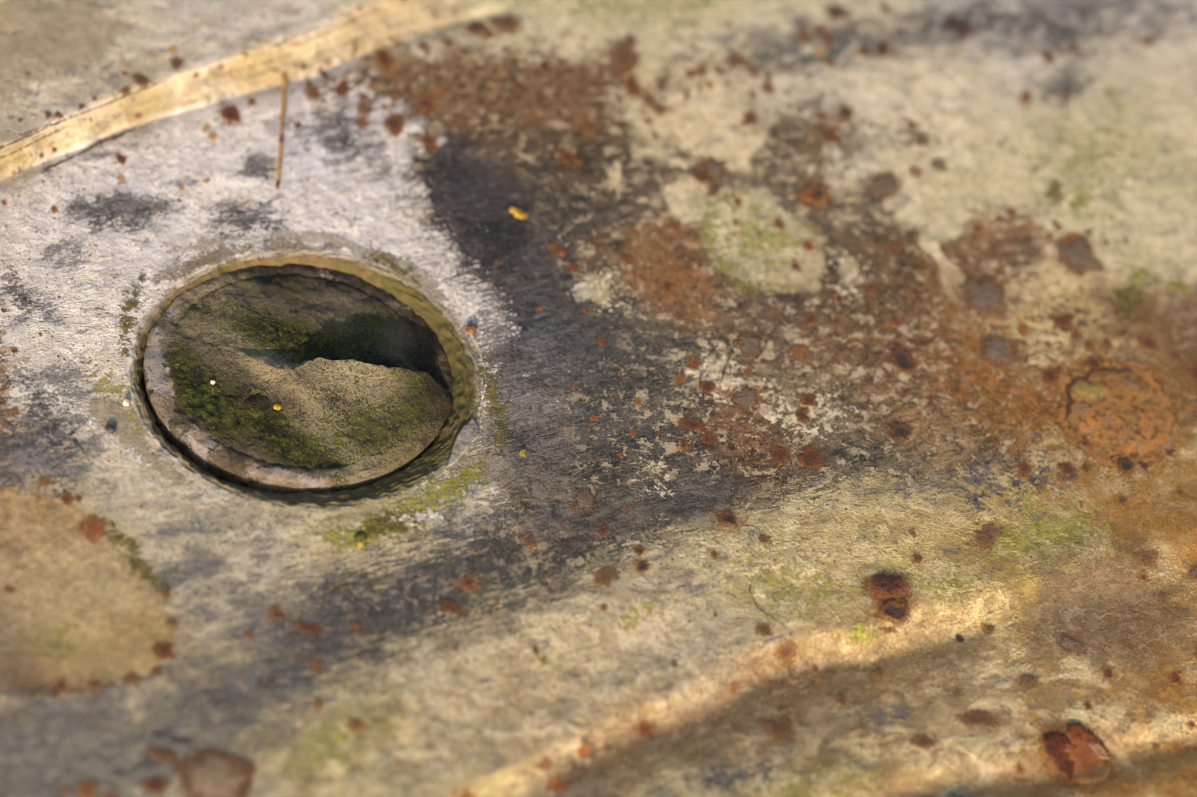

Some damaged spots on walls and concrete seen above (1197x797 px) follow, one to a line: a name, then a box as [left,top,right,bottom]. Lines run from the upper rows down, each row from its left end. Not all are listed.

corrosion [271,15,946,197]
corrosion [1019,88,1047,106]
corrosion [674,355,716,394]
corrosion [908,261,1197,482]
corrosion [795,392,818,423]
corrosion [677,418,713,454]
corrosion [769,445,826,469]
corrosion [1021,550,1191,682]
corrosion [139,747,257,797]